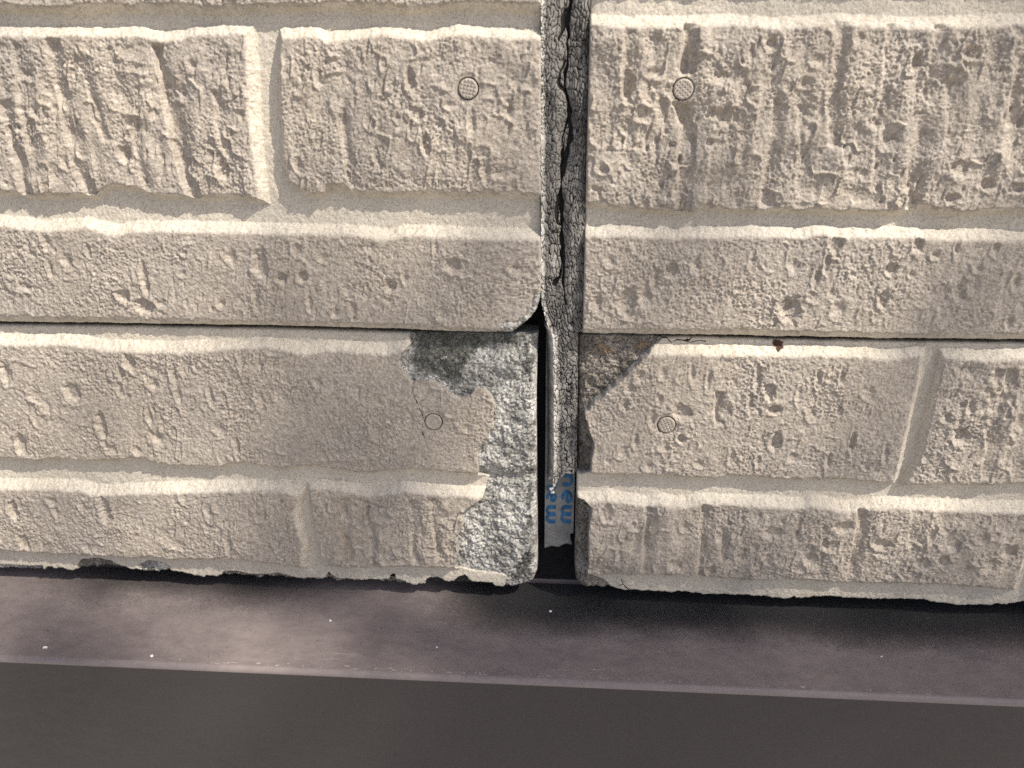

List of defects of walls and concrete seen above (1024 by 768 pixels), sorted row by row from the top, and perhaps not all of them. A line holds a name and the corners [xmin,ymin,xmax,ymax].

crack [541,0,590,482]
spalling [400,292,555,586]
spalling [577,332,662,469]